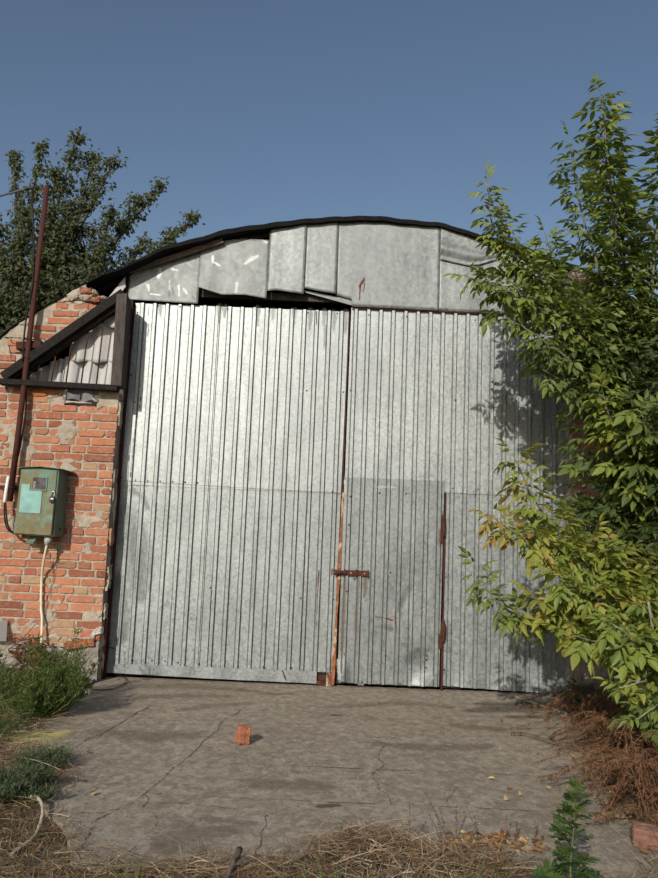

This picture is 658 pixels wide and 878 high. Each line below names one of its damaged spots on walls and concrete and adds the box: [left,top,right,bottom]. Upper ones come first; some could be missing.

spalling [88,468,118,650]
crack [56,709,449,862]